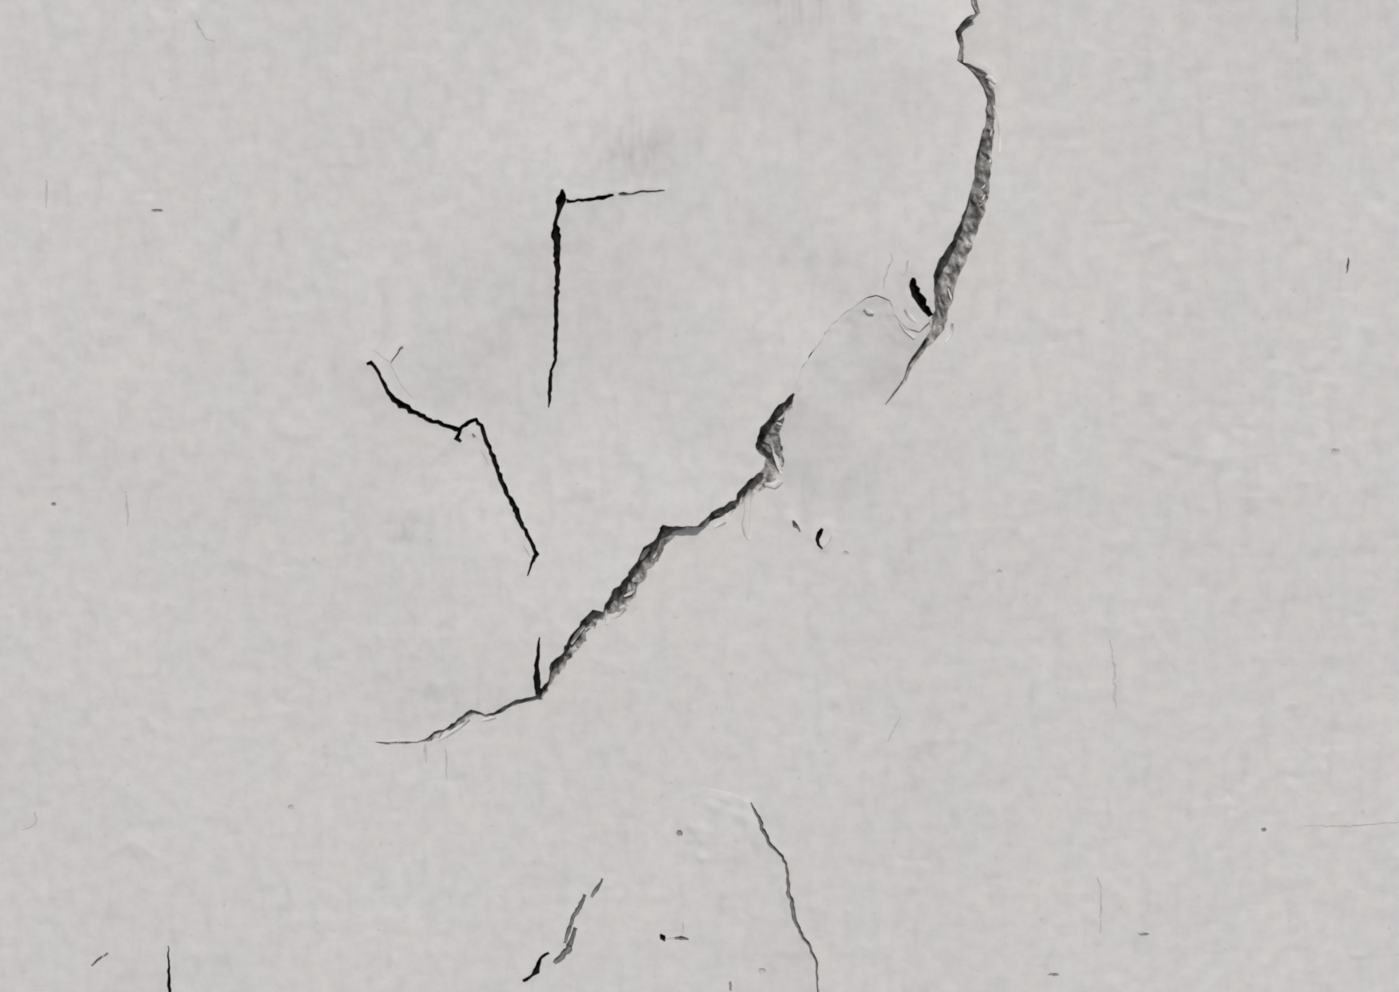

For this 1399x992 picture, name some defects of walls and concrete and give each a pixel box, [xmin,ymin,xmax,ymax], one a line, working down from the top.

crack [547,189,665,407]
crack [367,346,539,576]
spalling [703,296,931,540]
crack [522,878,603,982]